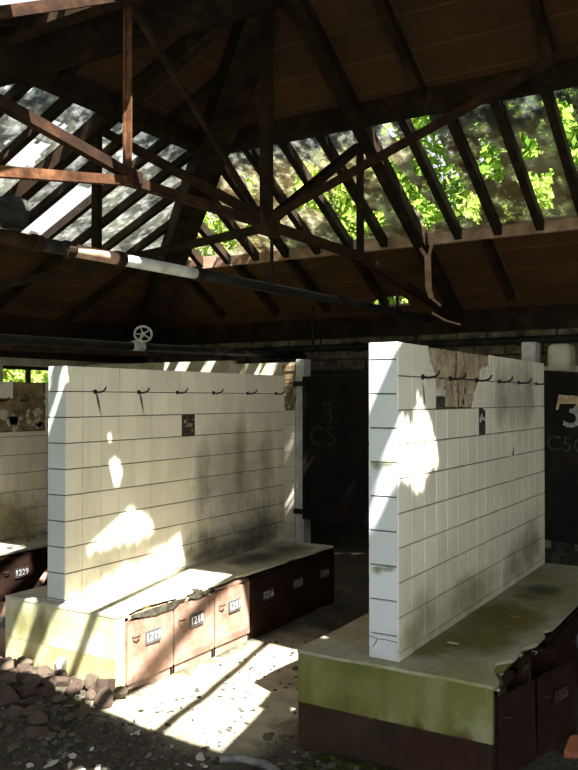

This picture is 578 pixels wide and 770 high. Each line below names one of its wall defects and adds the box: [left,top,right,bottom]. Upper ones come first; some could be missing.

spalling [0,382,44,432]
spalling [428,348,488,433]